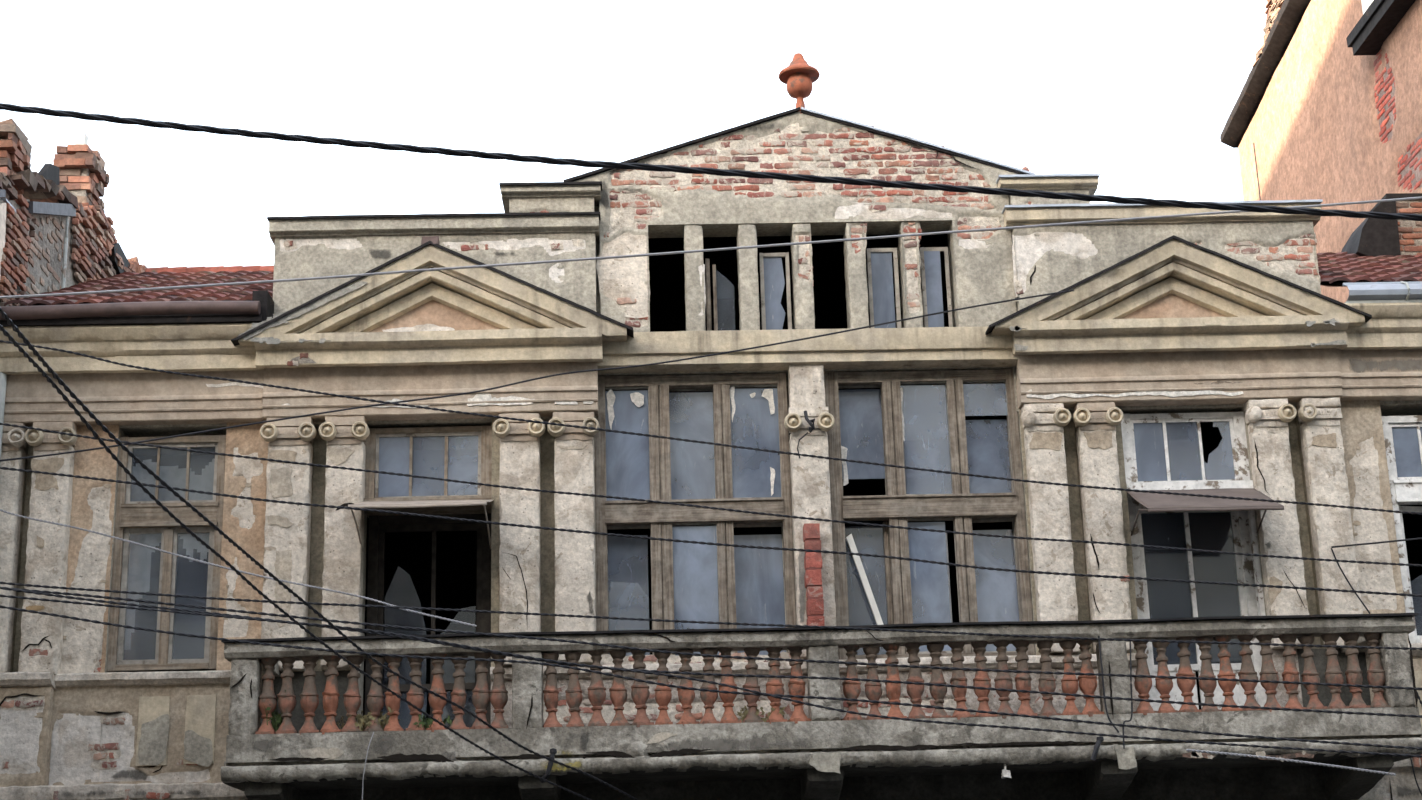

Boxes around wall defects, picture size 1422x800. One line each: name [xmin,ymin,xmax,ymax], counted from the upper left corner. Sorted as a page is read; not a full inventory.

flaking render [1373,49,1396,143]
flaking render [1397,132,1422,192]
flaking render [443,123,1098,328]
flaking render [1225,232,1321,283]
peeling [231,447,293,529]
peeling [0,696,213,800]
flaking render [1402,757,1422,768]